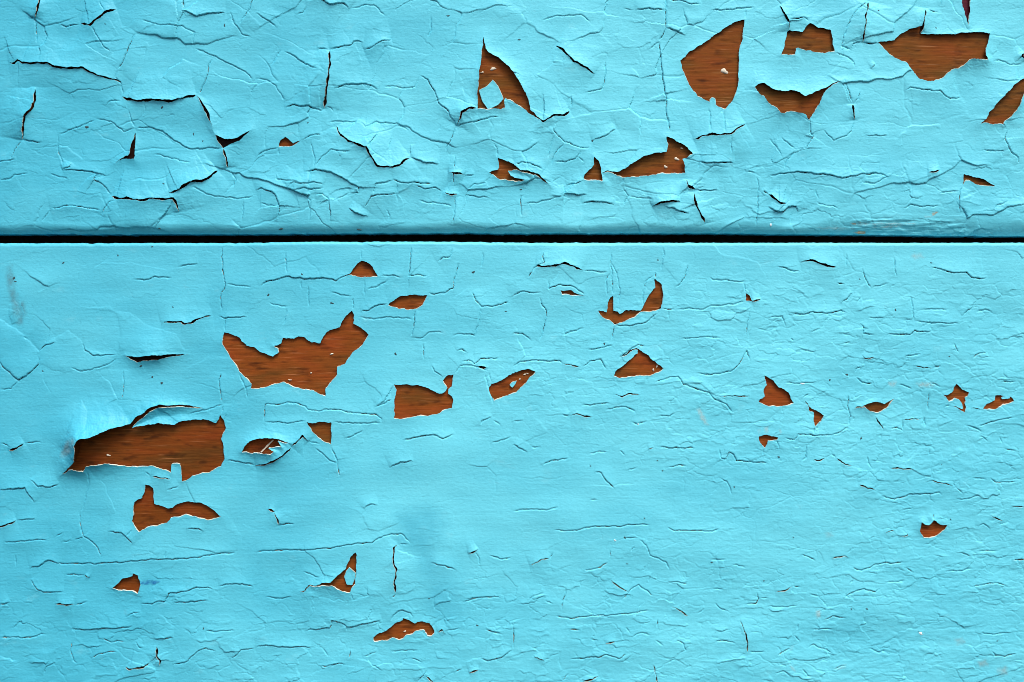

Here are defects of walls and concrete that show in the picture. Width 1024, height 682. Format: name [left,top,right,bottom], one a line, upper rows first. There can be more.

crack [0,0,503,227]
peeling [581,134,697,185]
crack [491,0,890,230]
peeling [678,16,847,124]
crack [903,86,963,101]
peeling [875,0,993,85]
crack [0,335,126,402]
peeling [219,308,372,400]
peeling [391,371,457,423]
peeling [58,401,293,536]
crack [159,244,1024,682]
crack [0,478,547,682]